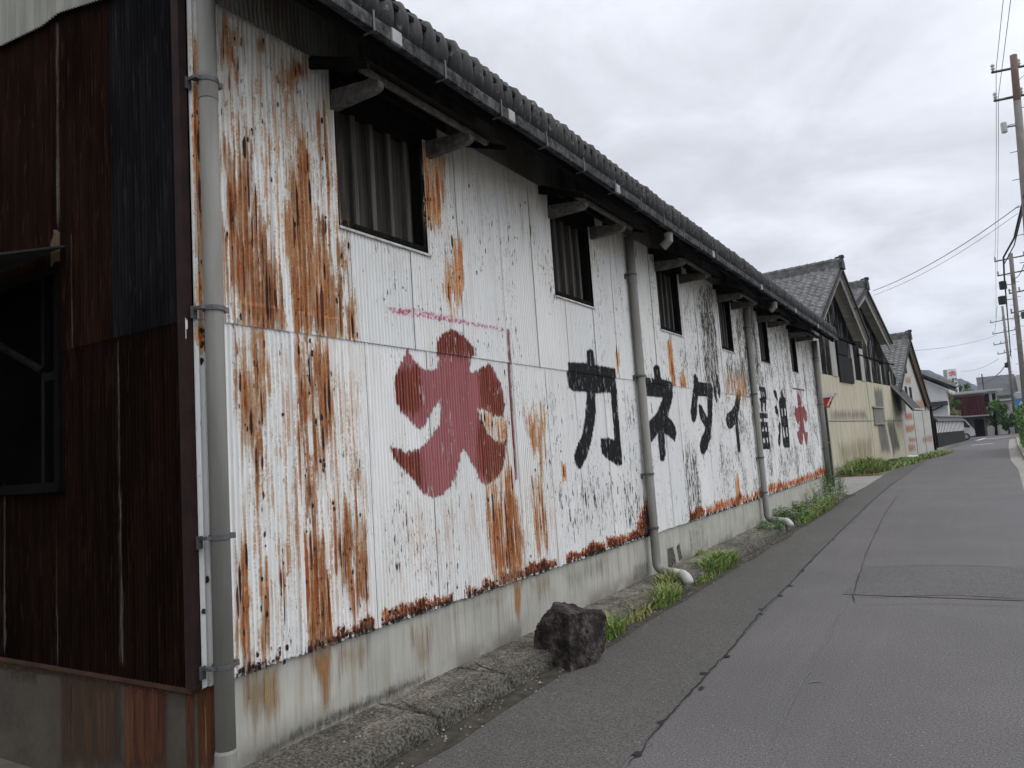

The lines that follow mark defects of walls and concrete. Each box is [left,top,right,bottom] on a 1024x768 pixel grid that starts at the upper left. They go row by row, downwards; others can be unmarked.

corrosion [443,235,465,321]
corrosion [219,11,454,714]
corrosion [667,337,687,388]
corrosion [466,404,650,617]
corrosion [689,466,826,522]
corrosion [0,663,215,768]